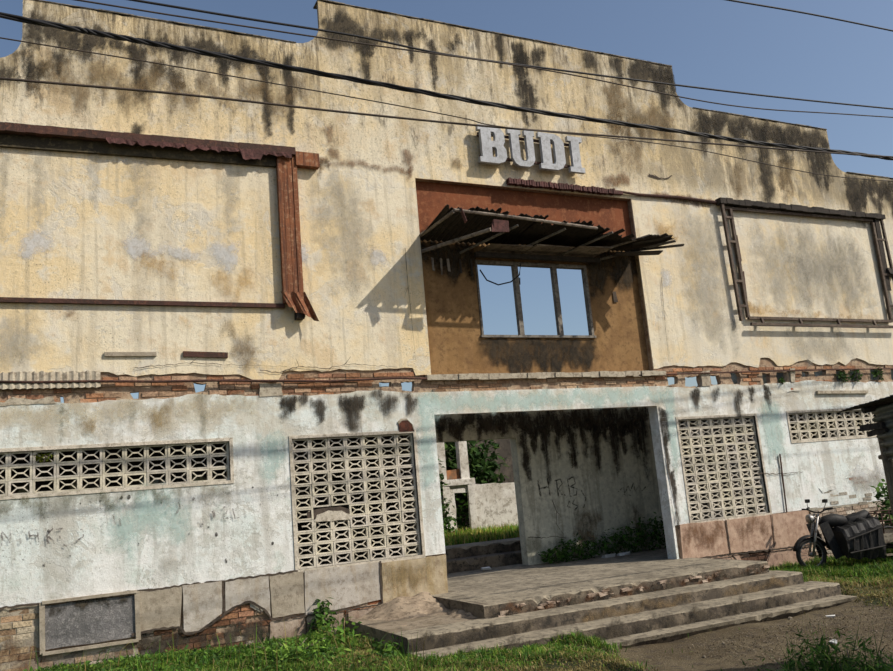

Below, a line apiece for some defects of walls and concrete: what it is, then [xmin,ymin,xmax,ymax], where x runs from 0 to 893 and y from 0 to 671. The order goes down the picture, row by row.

damp [0,11,303,135]
damp [495,34,545,126]
damp [694,110,833,203]
spalling [0,376,192,406]
spalling [207,372,510,397]
damp [340,387,417,431]
damp [479,338,595,373]
spalling [522,368,721,456]
spalling [742,366,862,392]
damp [434,407,680,530]
spalling [498,580,667,617]
spalling [0,603,271,671]